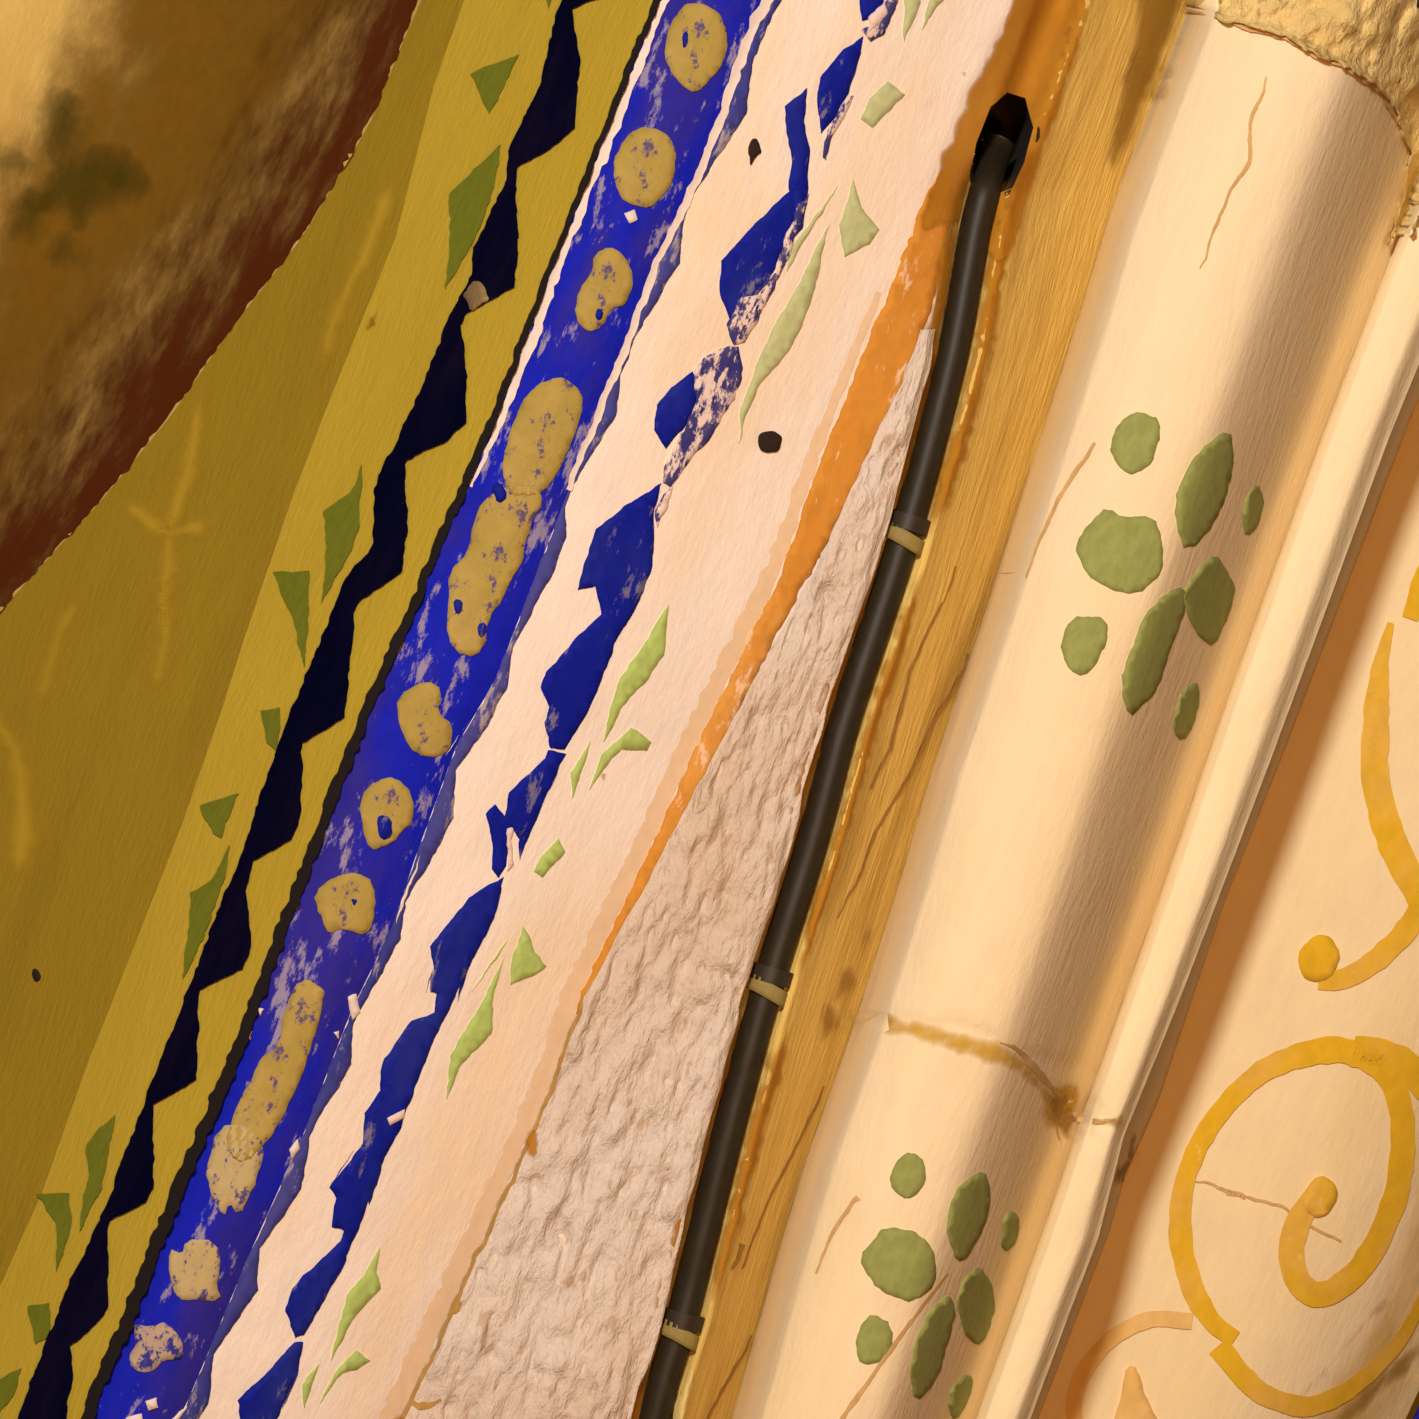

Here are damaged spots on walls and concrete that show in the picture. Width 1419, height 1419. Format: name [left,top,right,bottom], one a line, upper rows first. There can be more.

spalling [1185,0,1419,245]
crack [1000,1042,1116,1140]